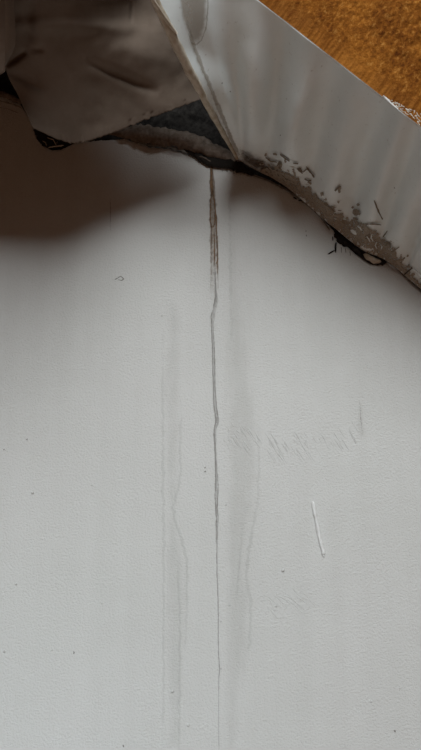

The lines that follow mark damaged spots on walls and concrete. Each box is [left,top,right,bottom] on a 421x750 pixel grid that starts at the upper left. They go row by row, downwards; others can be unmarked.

spalling [33,129,70,149]
peeling [184,149,421,289]
crack [211,350,219,522]